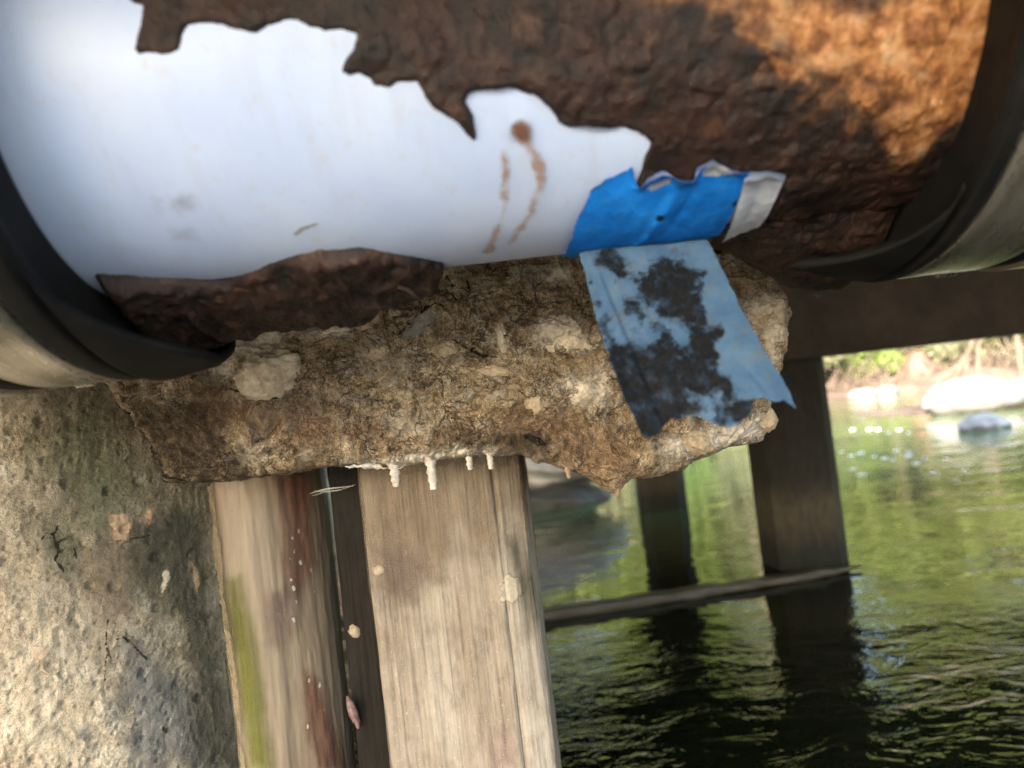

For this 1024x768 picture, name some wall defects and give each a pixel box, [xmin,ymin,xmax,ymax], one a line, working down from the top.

rust [483,225,499,253]
rust [511,121,544,242]
rust [131,0,990,223]
water stain [345,433,547,587]